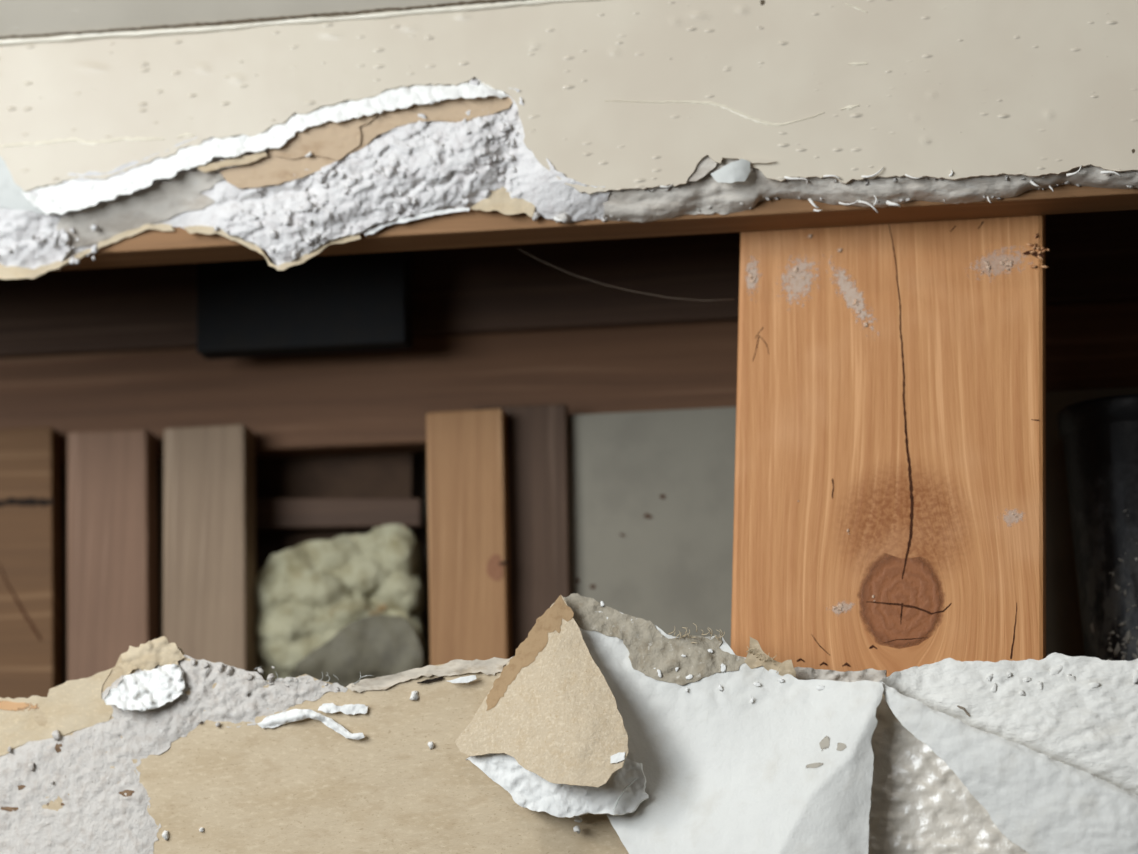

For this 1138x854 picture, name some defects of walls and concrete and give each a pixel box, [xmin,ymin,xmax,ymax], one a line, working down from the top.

spalling [0,78,610,280]
peeling [687,156,751,183]
crack [866,226,951,643]